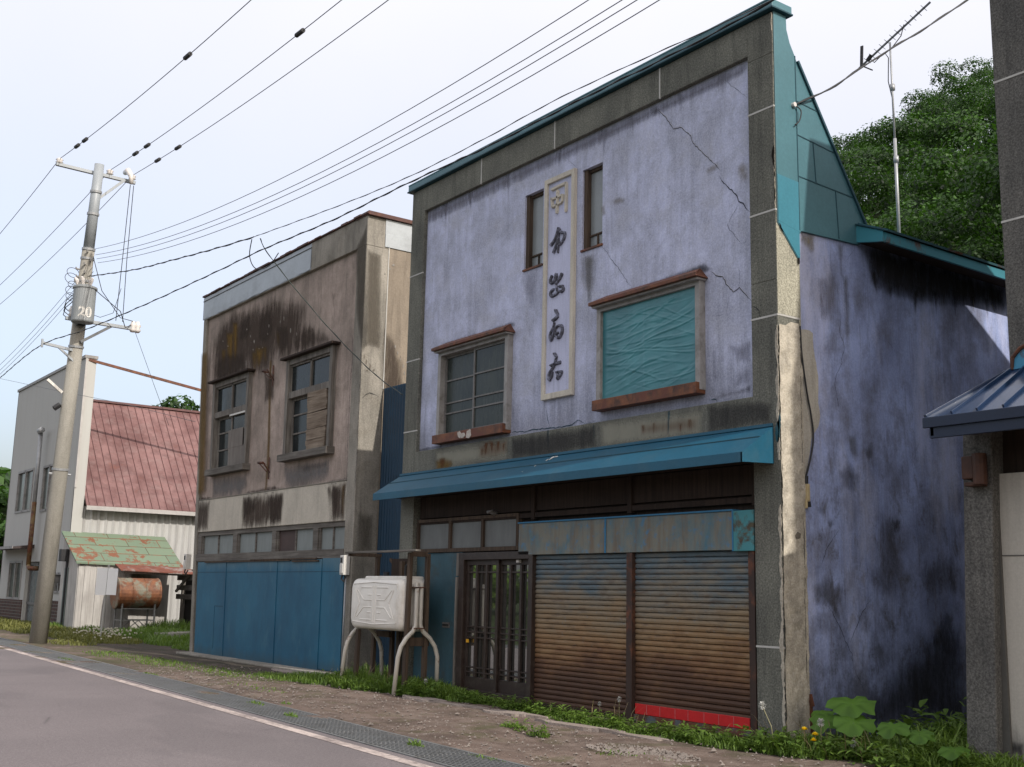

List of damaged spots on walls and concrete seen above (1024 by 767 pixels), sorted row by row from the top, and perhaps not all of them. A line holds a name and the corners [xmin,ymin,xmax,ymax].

crack [660,111,750,242]
crack [712,270,760,316]
leakage [214,302,328,380]
leakage [242,487,282,527]
leakage [876,622,958,717]